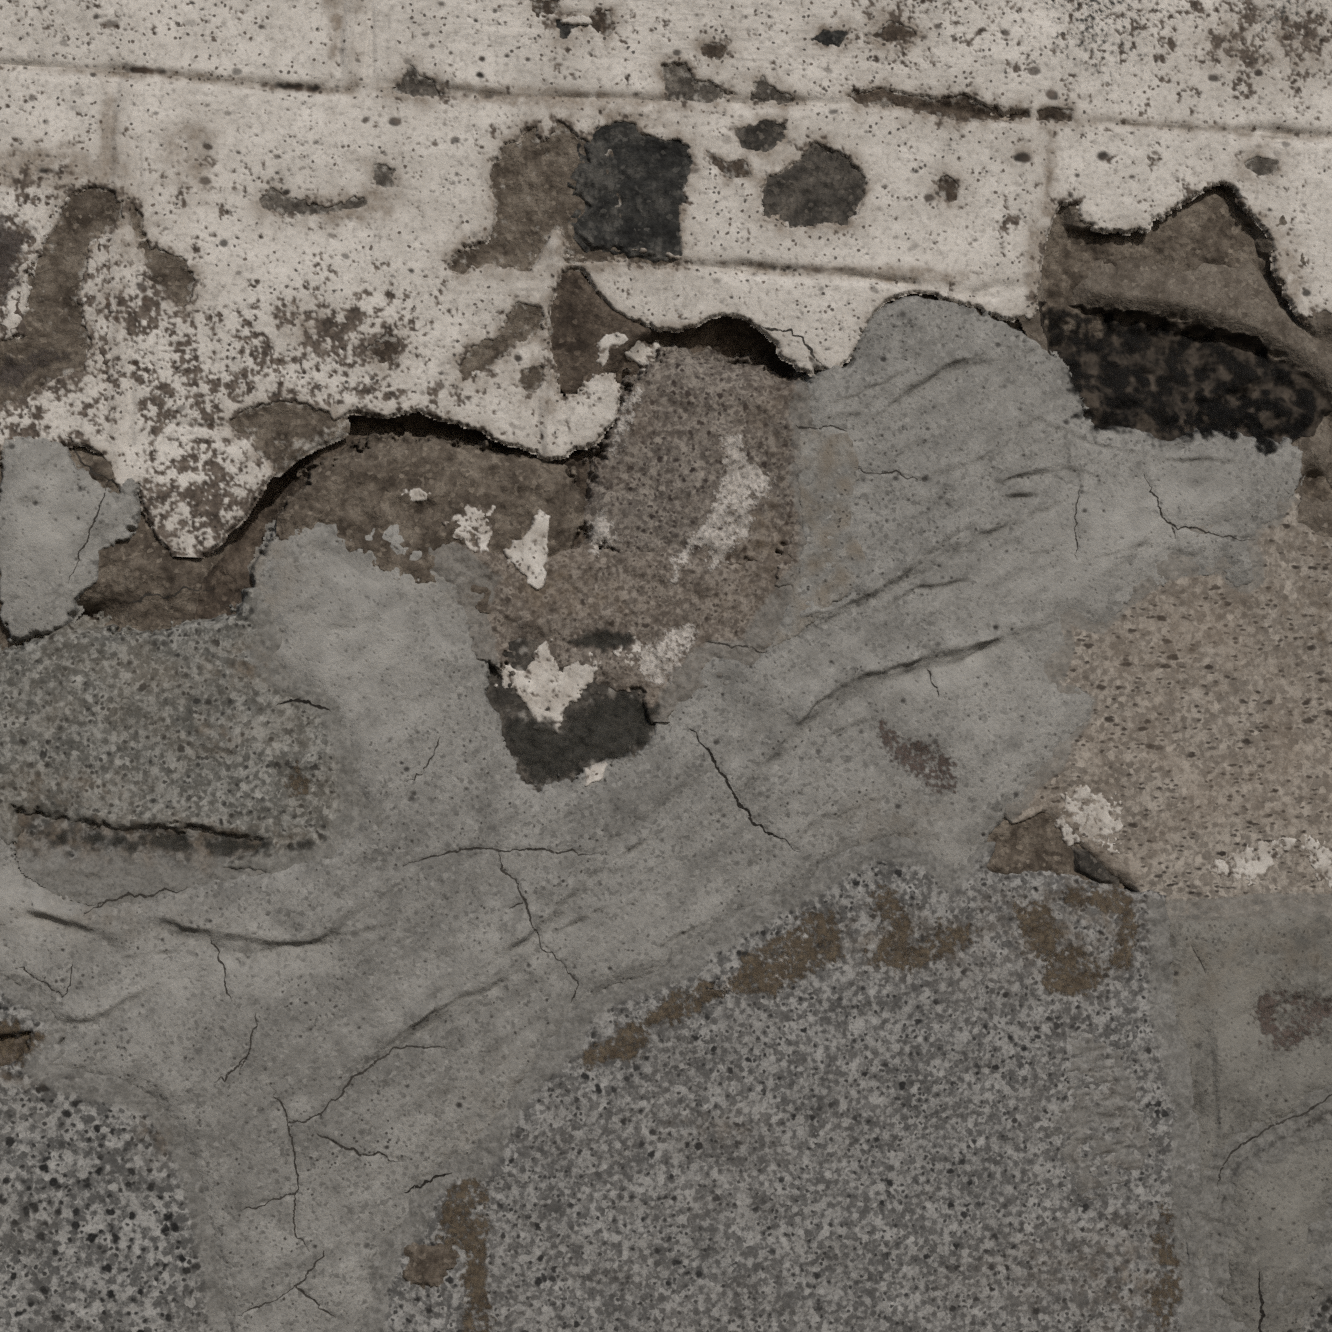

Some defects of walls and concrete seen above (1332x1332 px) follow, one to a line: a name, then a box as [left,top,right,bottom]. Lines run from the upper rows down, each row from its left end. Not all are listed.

spalling [661,64,732,103]
spalling [750,75,793,105]
spalling [762,143,867,228]
spalling [0,187,195,405]
spalling [194,120,815,620]
spalling [1018,184,1332,537]
crack [406,737,440,782]
spalling [486,623,699,792]
crack [690,729,799,852]
crack [404,847,604,1002]
crack [210,939,258,1083]
crack [239,1045,452,1316]